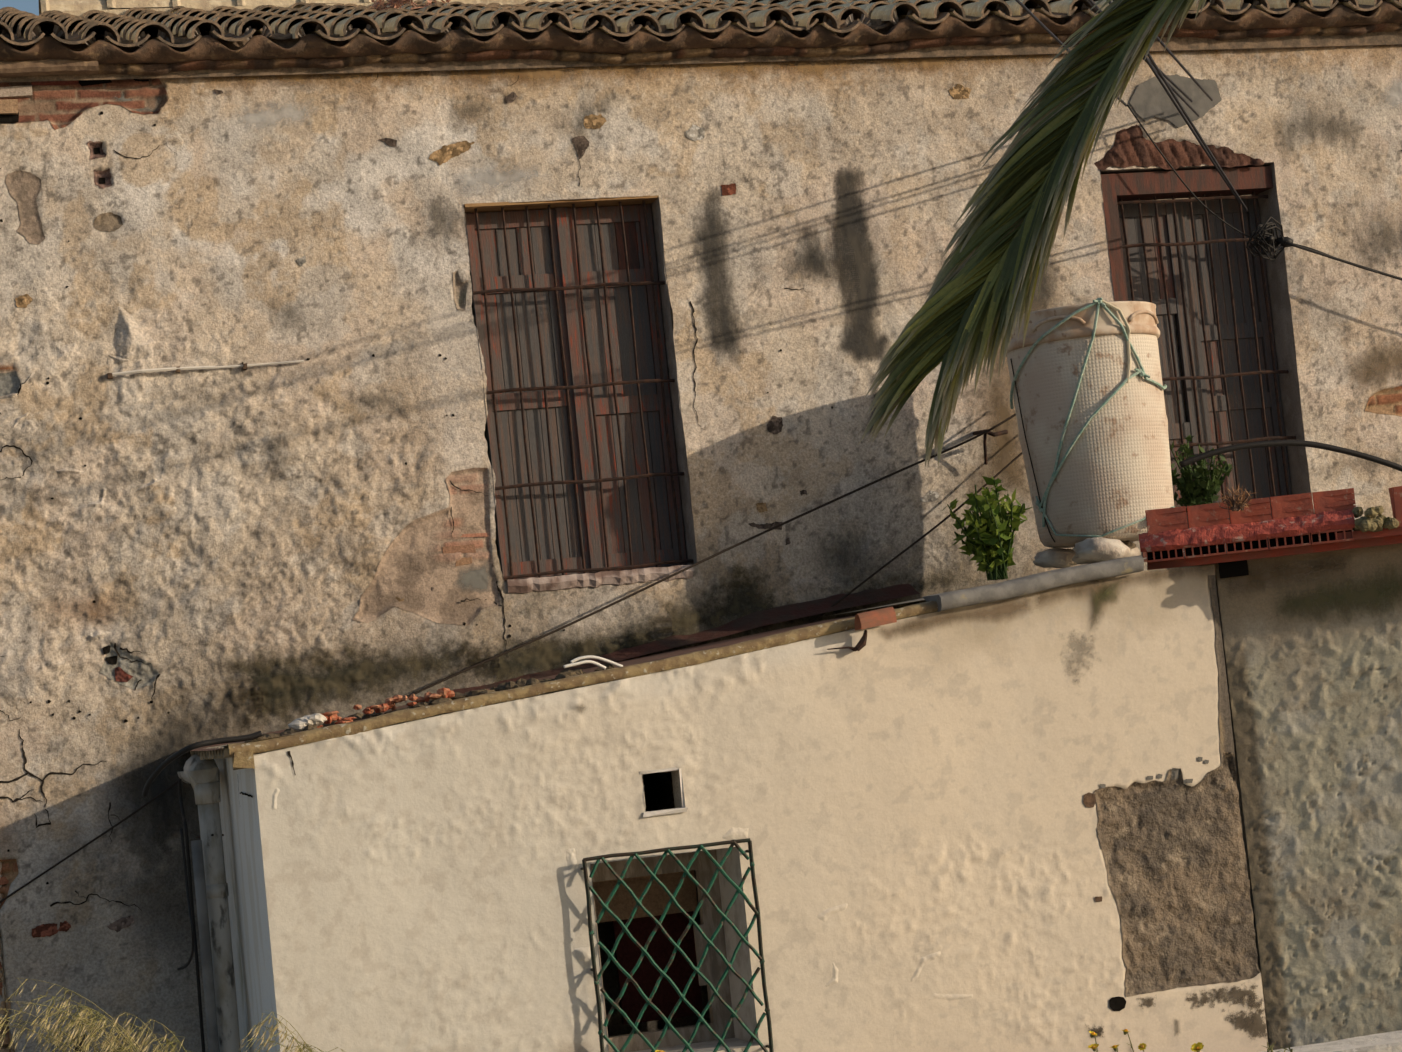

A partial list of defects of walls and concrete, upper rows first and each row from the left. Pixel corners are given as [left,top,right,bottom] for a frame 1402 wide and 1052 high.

flaking render [0,78,169,130]
flaking render [5,170,45,244]
damp [698,197,739,356]
damp [791,170,887,360]
flaking render [1365,386,1402,416]
flaking render [352,468,500,626]
flaking render [100,643,160,703]
crack [0,710,106,828]
flaking render [1083,575,1260,1011]
flaking render [0,859,19,909]
flaking render [0,944,15,1052]